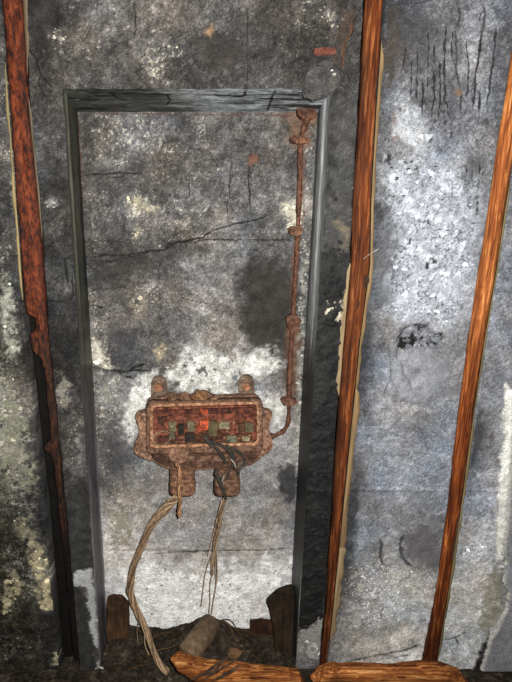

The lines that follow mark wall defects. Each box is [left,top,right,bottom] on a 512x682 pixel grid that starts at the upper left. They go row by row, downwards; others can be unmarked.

crack [455,7,485,110]
crack [92,154,294,262]
spalling [383,97,483,356]
leakage [102,262,292,467]